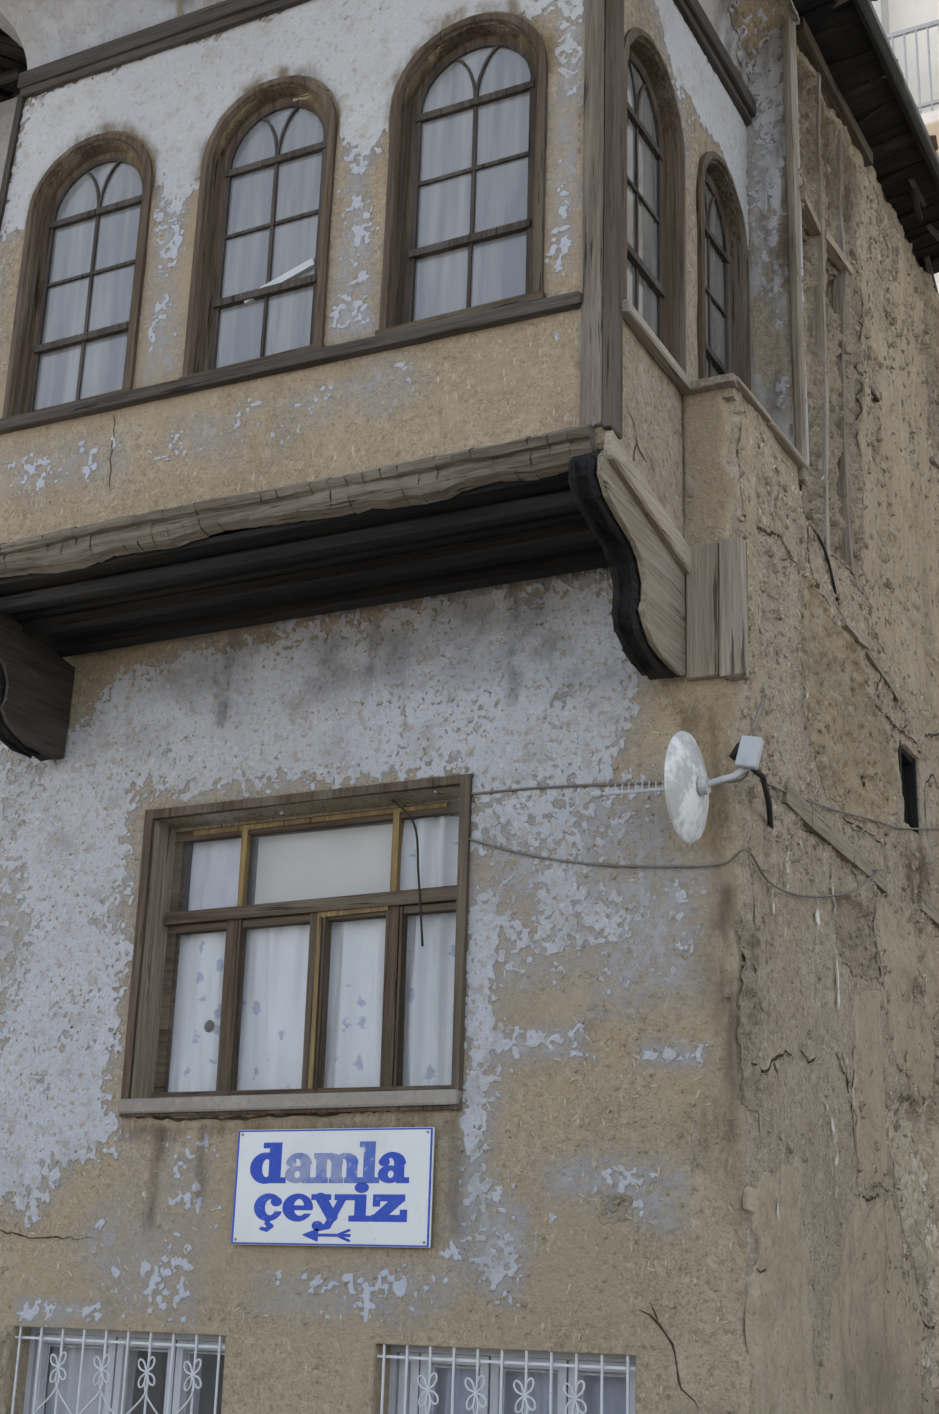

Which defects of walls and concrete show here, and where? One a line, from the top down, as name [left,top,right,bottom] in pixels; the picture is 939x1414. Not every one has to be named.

peeling [0,0,585,367]
peeling [0,429,141,508]
peeling [147,385,339,461]
crack [737,434,939,849]
peeling [0,568,712,1307]
crack [747,895,922,1211]
crack [0,1228,98,1242]
peeling [17,1226,195,1327]
peeling [299,1264,449,1323]
crack [639,1303,701,1410]